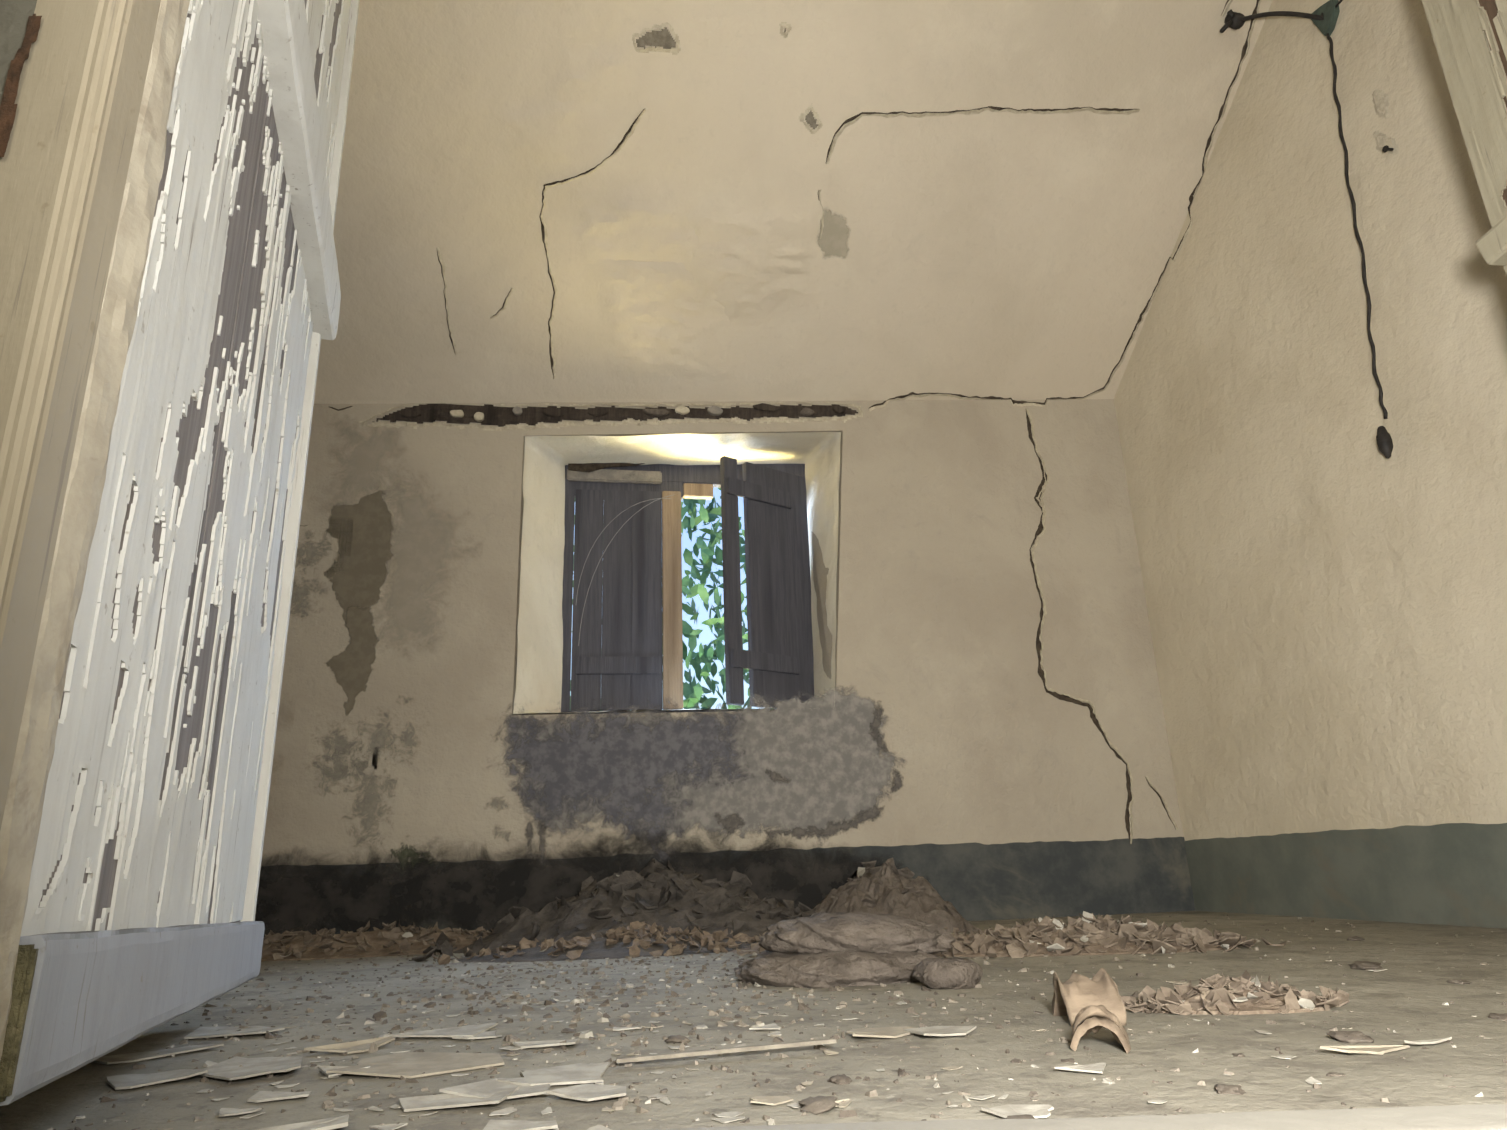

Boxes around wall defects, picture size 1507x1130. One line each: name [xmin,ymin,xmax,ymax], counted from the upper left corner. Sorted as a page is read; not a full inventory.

peeling [306,0,351,191]
crack [437,247,457,355]
crack [490,288,514,319]
crack [539,109,646,379]
crack [818,106,1140,239]
peeling [1421,0,1507,228]
peeling [20,0,313,937]
crack [869,0,1261,844]
spalling [507,687,904,844]